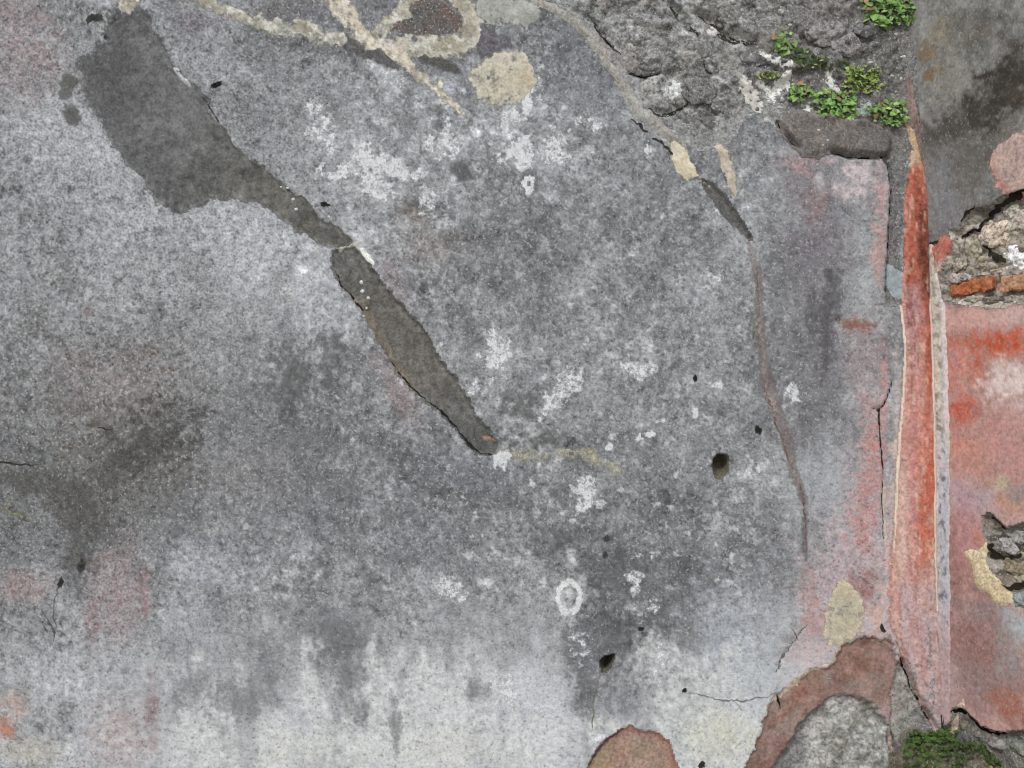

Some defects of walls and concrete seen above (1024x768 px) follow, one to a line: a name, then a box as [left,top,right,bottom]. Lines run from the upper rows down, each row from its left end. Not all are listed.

spalling [932,189,1024,309]
crack [749,243,808,559]
crack [873,382,892,539]
spalling [981,512,1024,608]
crack [690,626,807,711]
spalling [745,576,1024,768]
spalling [587,725,680,768]